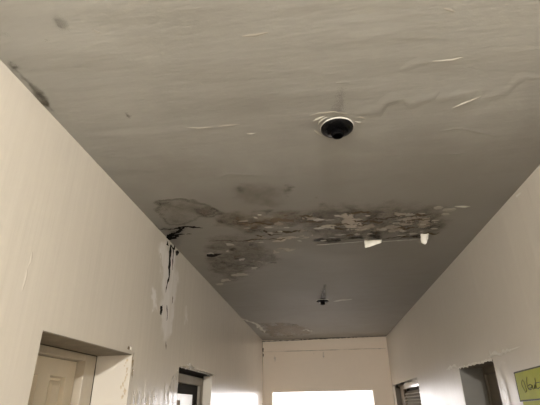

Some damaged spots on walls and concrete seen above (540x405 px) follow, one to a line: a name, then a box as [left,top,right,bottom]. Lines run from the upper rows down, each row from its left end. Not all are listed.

crack [160,226,200,317]
peeling [206,206,470,285]